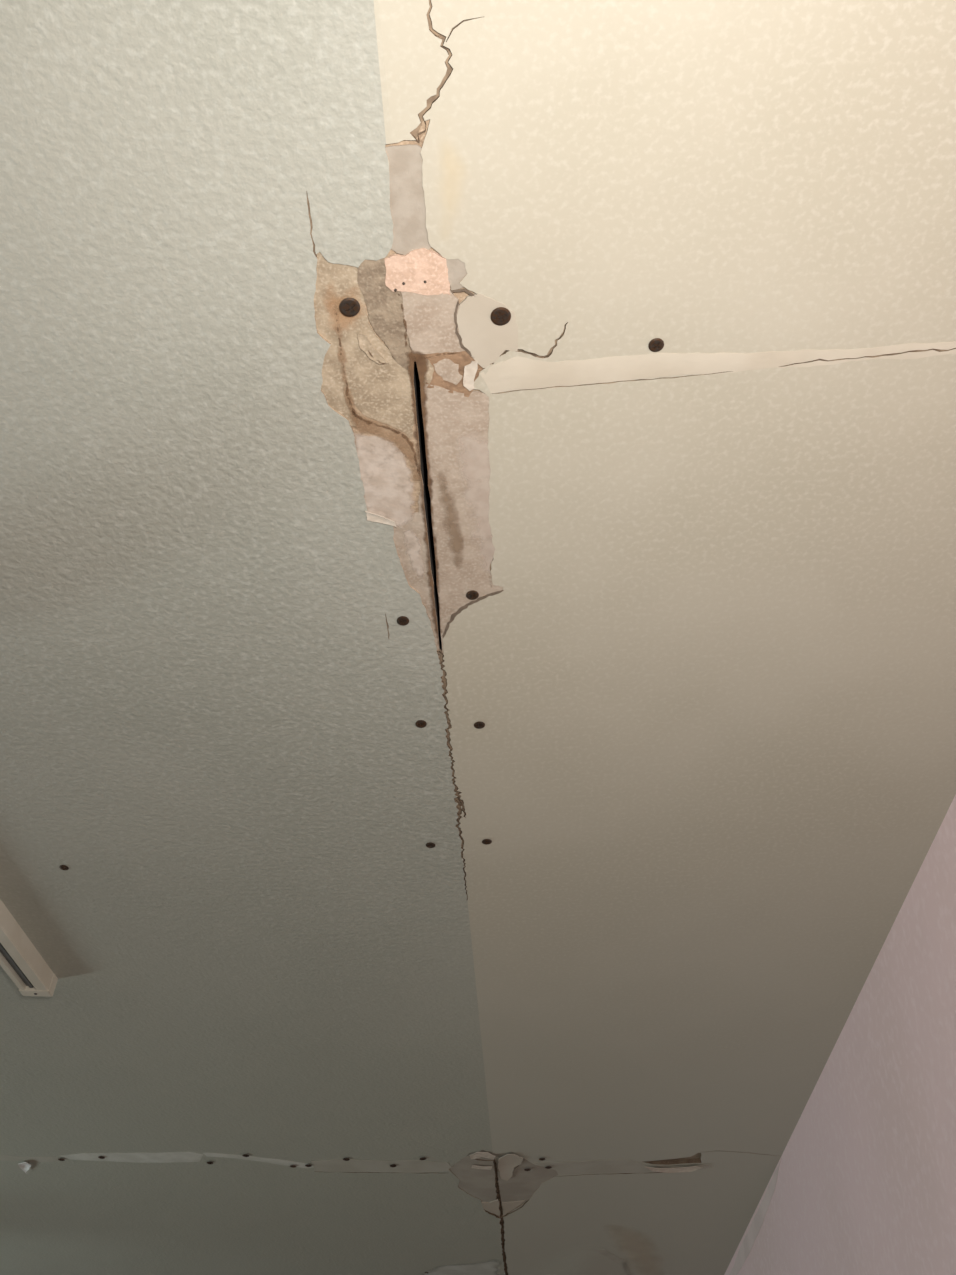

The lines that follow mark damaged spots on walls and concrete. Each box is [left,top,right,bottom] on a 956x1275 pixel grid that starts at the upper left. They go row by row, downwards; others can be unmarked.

crack [411,0,482,142]
spalling [314,119,518,657]
crack [477,325,731,394]
crack [780,348,954,367]
damp [346,304,463,643]
crack [414,362,468,899]
spalling [311,1150,558,1216]
crack [475,1159,528,1275]